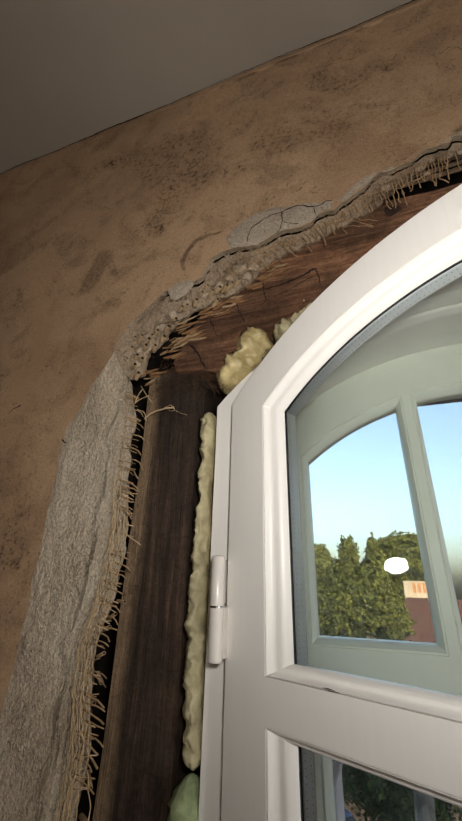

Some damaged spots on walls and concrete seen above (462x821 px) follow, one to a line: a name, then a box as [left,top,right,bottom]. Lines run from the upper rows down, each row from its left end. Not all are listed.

crack [1,0,415,174]
flaking render [114,143,462,380]
crack [247,200,332,241]
crack [261,268,321,305]
flaking render [0,353,137,821]